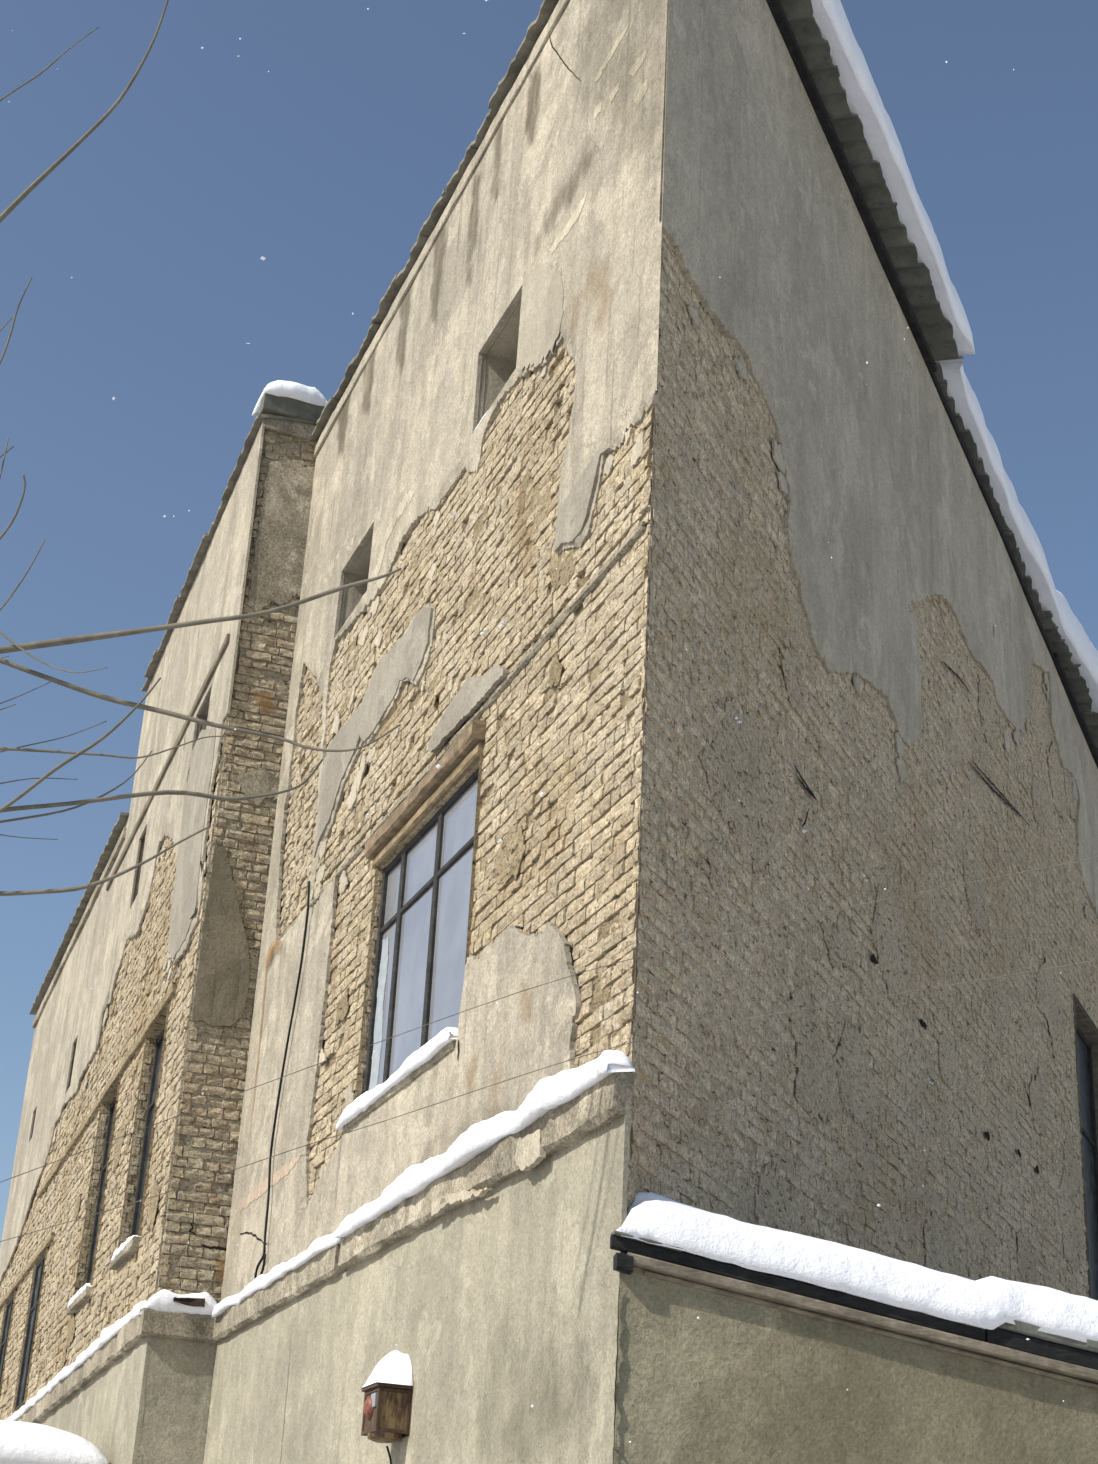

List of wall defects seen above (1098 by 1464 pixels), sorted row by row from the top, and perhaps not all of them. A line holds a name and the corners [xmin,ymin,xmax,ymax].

peeling [549,192,588,253]
peeling [594,20,648,119]
flaking render [0,431,317,1420]
flaking render [240,234,1098,1298]